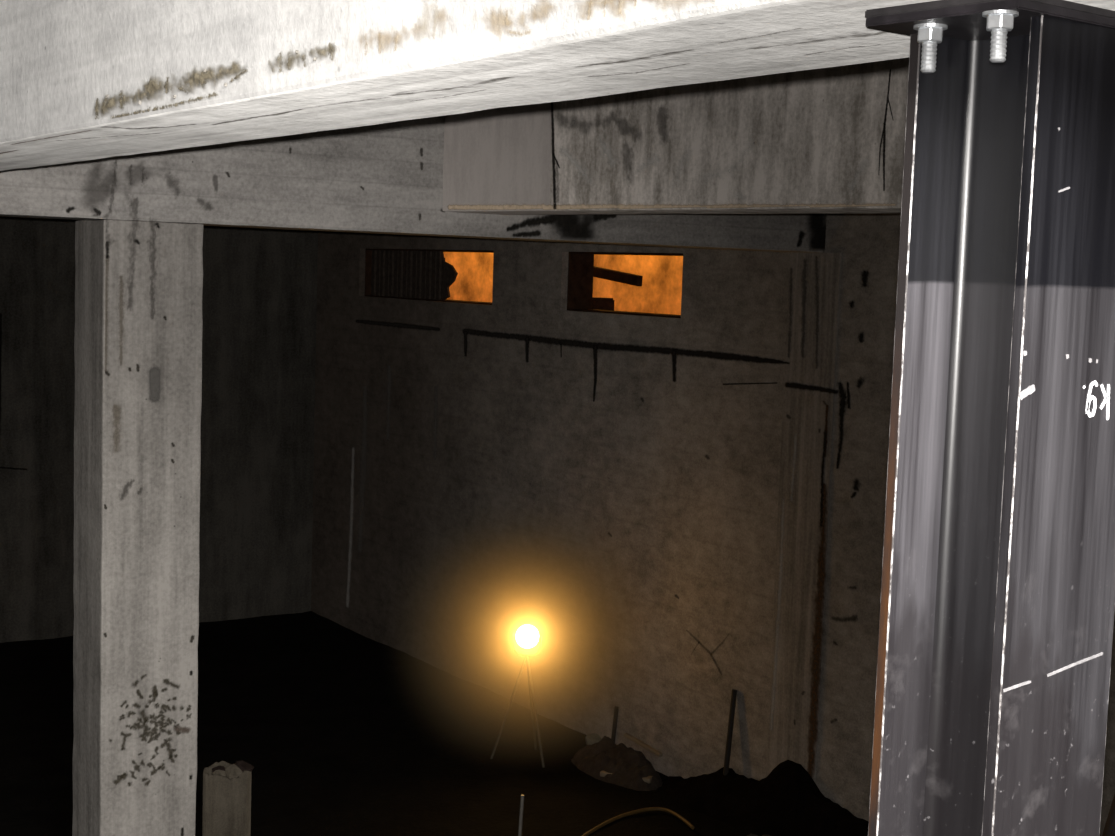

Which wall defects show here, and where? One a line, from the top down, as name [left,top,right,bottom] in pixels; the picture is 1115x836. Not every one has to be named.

corrosion [491,4,550,35]